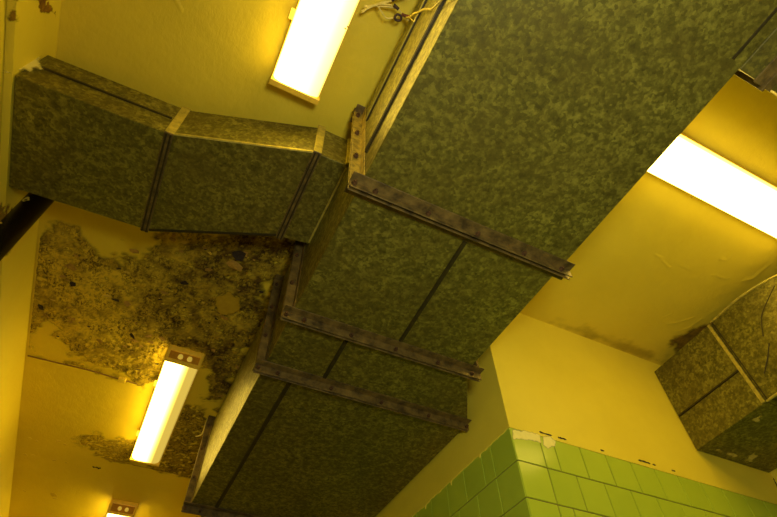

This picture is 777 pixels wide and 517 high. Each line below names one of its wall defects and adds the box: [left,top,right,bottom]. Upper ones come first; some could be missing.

peeling [30,222,295,413]
leakage [670,325,707,353]
peeling [80,435,136,462]
peeling [147,405,207,478]